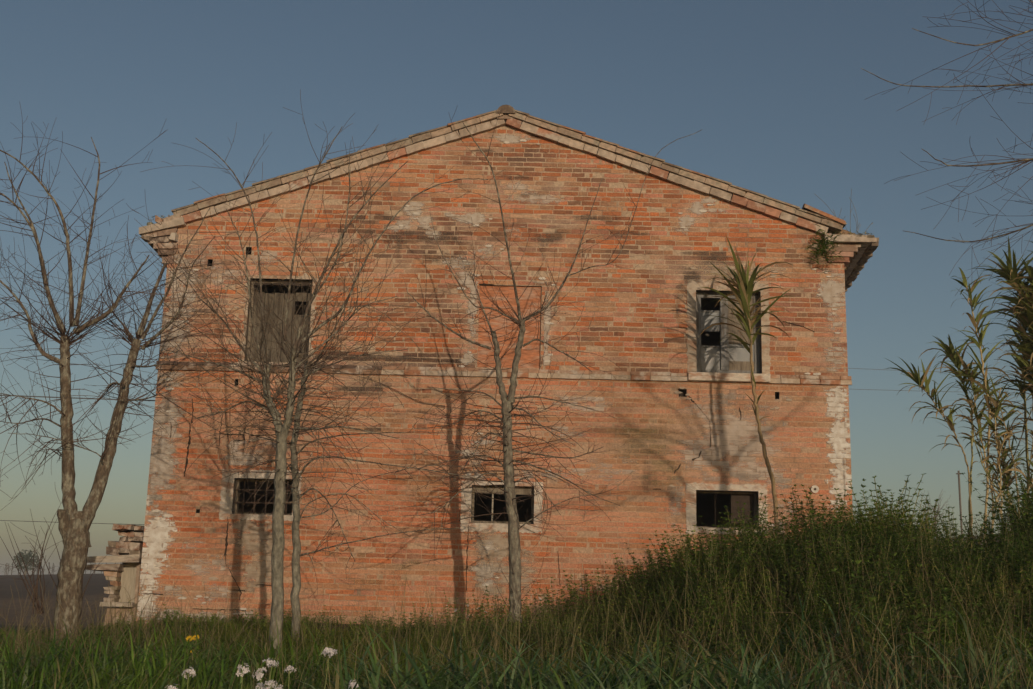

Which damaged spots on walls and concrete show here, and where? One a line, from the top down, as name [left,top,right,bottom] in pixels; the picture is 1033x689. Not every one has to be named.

peeling [159,246,240,358]
peeling [805,268,847,375]
crack [170,399,194,477]
peeling [137,372,276,623]
crack [219,415,275,447]
crack [654,396,711,490]
peeling [825,386,852,512]